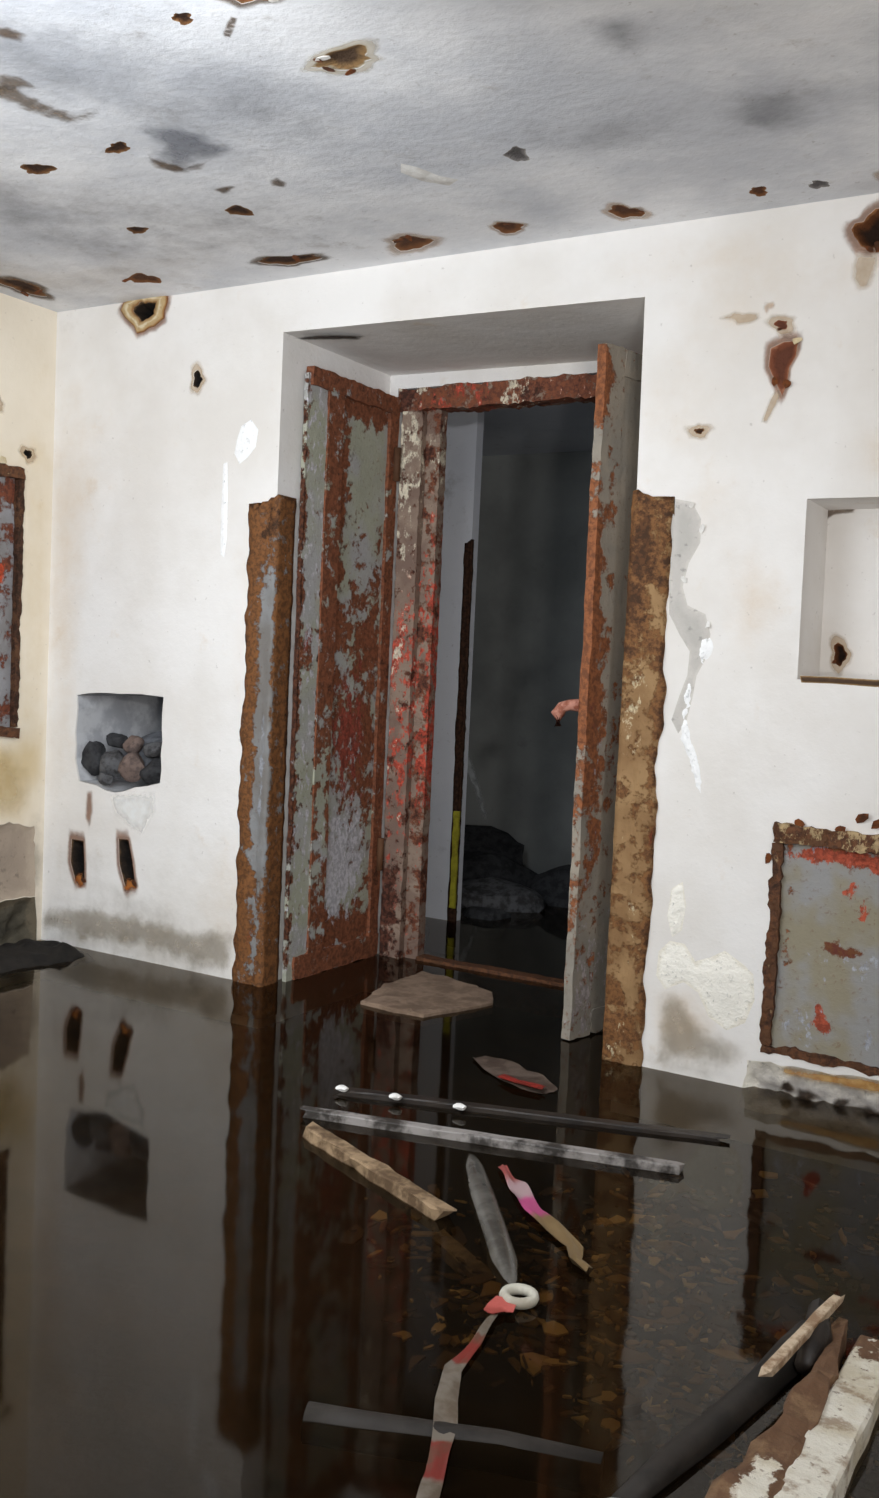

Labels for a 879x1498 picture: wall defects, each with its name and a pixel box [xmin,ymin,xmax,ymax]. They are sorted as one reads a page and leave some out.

spalling [171,13,193,25]
spalling [223,0,280,37]
spalling [306,41,377,76]
spalling [846,203,879,286]
spalling [120,273,169,335]
peeling [669,499,713,793]
peeling [0,822,37,945]
spalling [68,834,86,887]
spalling [117,834,137,892]
leakage [656,882,754,1030]